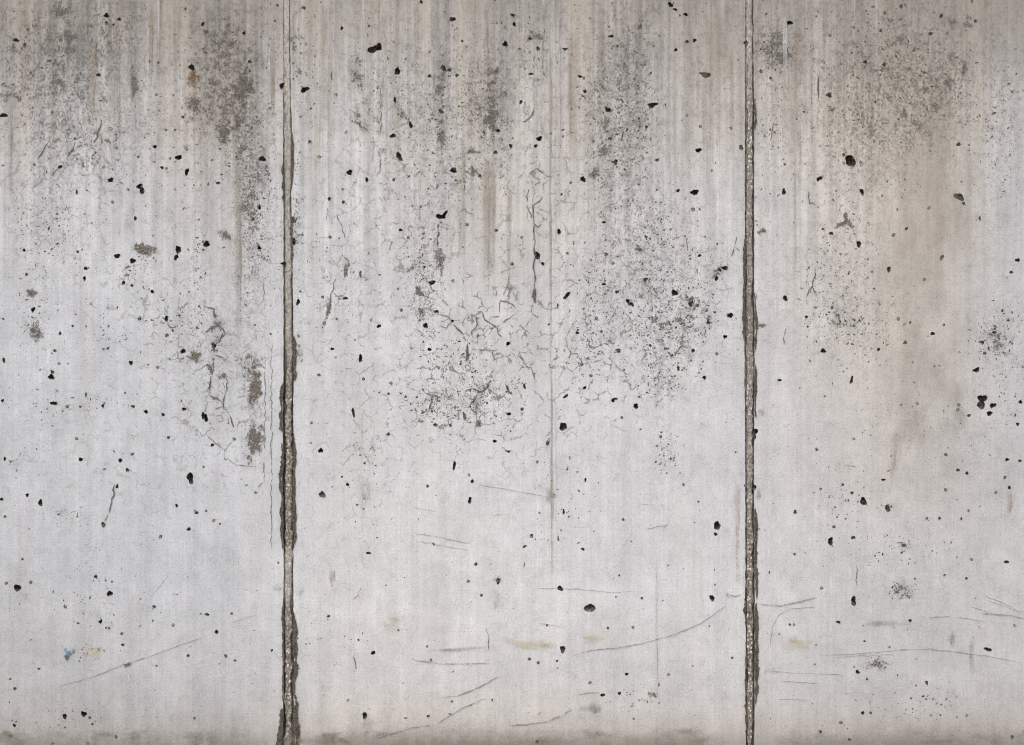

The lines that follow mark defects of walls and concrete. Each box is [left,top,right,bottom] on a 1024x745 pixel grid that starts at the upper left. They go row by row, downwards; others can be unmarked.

crack [423,168,543,420]
crack [206,307,273,546]